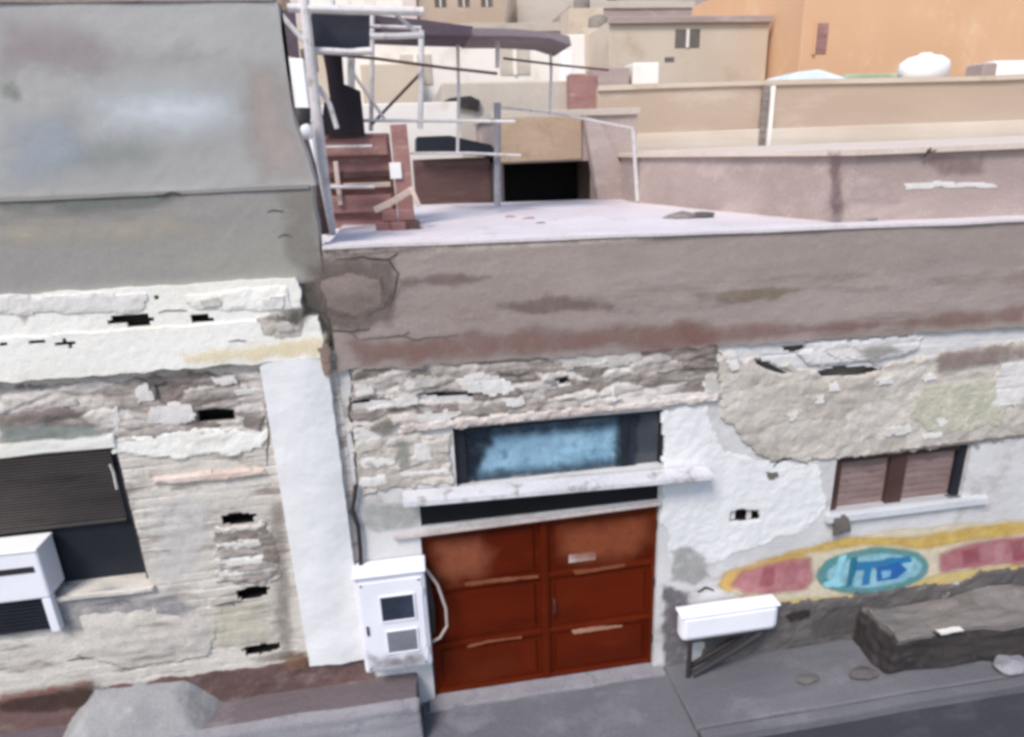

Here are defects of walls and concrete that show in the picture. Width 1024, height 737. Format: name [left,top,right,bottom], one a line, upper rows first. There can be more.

leakage [830,154,844,214]
spalling [30,338,76,348]
spalling [108,313,154,327]
peeling [191,297,221,322]
spalling [256,295,303,338]
crack [307,253,459,341]
spalling [0,369,268,460]
spalling [347,334,1024,569]
spalling [213,512,283,600]
spalling [242,642,280,654]